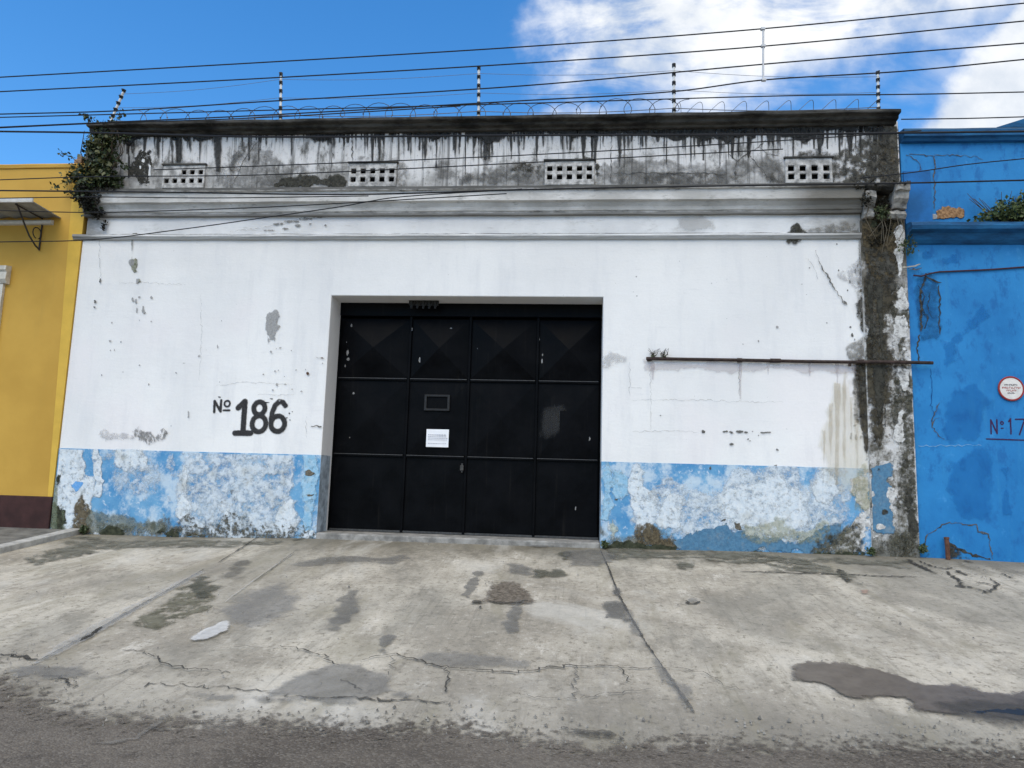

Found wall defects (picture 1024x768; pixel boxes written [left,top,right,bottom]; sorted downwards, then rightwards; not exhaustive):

mould [274,174,347,187]
damp [117,126,900,183]
peeling [129,258,153,322]
crack [819,262,847,305]
peeling [265,309,292,353]
damp [787,222,942,557]
peeling [56,449,320,539]
peeling [600,461,898,553]
crack [925,522,993,560]
crack [0,653,77,688]
crack [108,645,743,703]